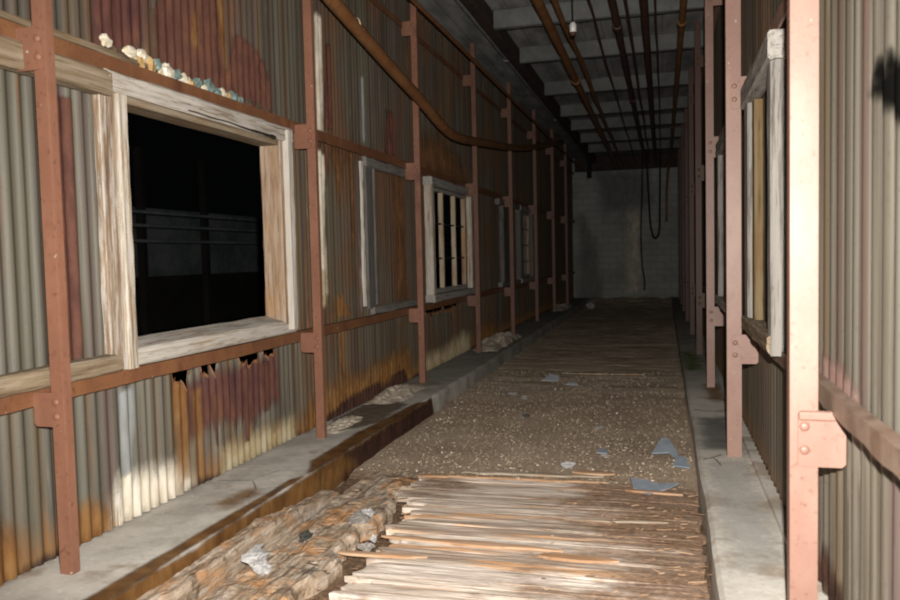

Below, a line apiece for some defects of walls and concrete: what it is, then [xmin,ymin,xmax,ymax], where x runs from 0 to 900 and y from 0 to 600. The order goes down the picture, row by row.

corrosion [90,0,272,111]
corrosion [172,355,278,481]
corrosion [305,354,412,431]
corrosion [0,535,18,586]
corrosion [78,507,123,547]
corrosion [85,399,434,600]